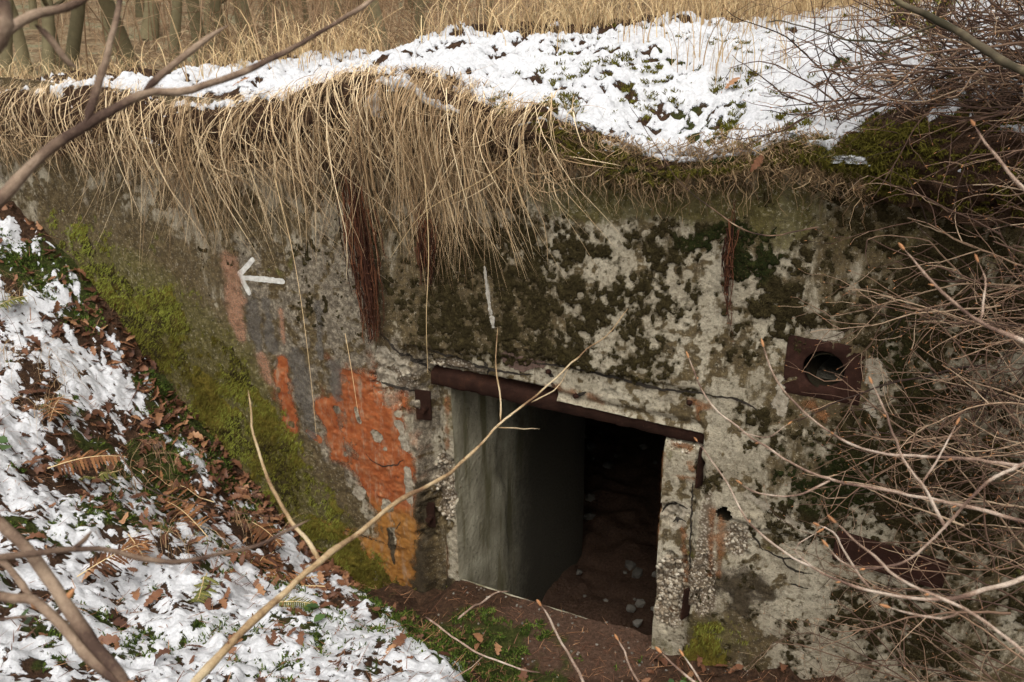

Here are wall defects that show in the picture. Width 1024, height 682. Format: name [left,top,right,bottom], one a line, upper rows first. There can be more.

peeling [273,354,421,588]
spalling [661,501,691,530]
spalling [665,439,695,454]
spalling [655,522,752,629]